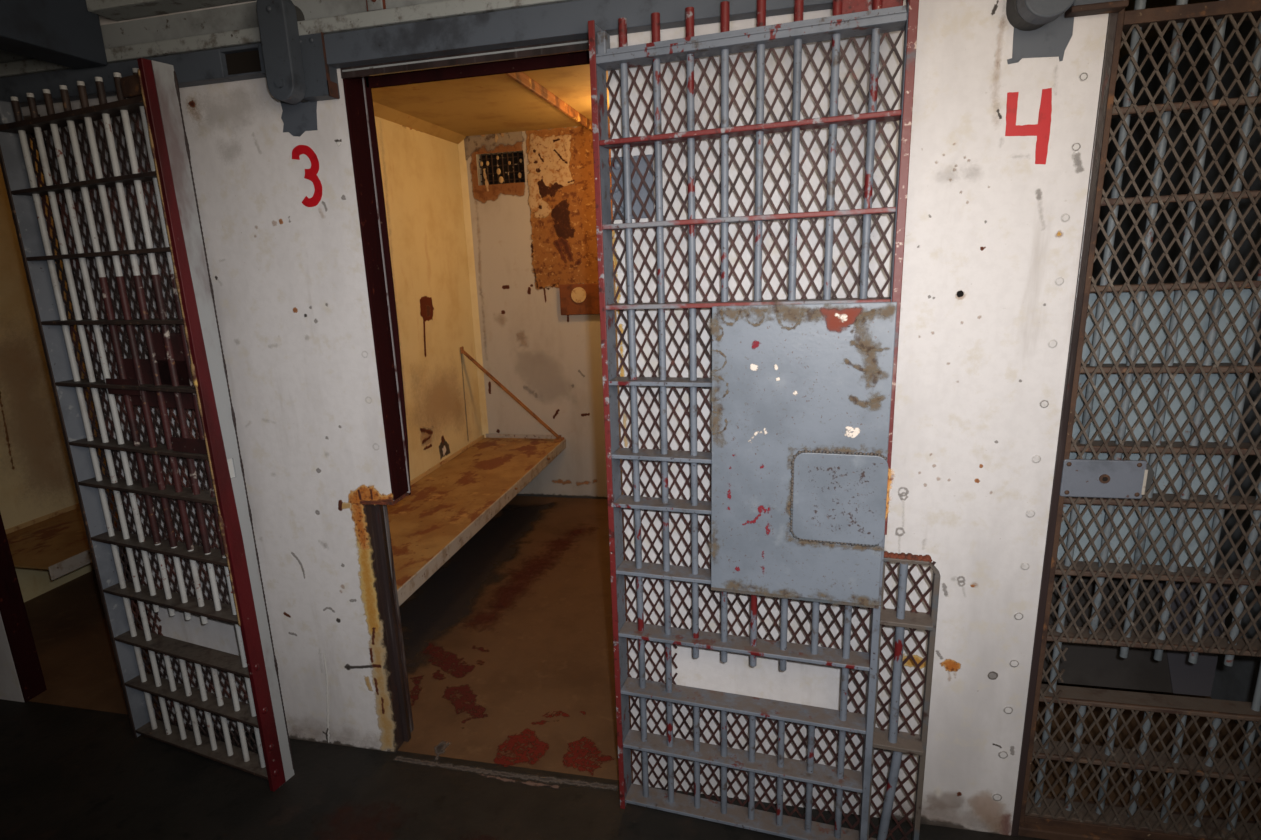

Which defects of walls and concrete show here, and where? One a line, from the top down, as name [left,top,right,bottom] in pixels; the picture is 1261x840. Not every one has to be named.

spalling [464,126,599,290]
corrosion [420,296,434,357]
corrosion [338,485,395,752]
corrosion [903,651,961,672]